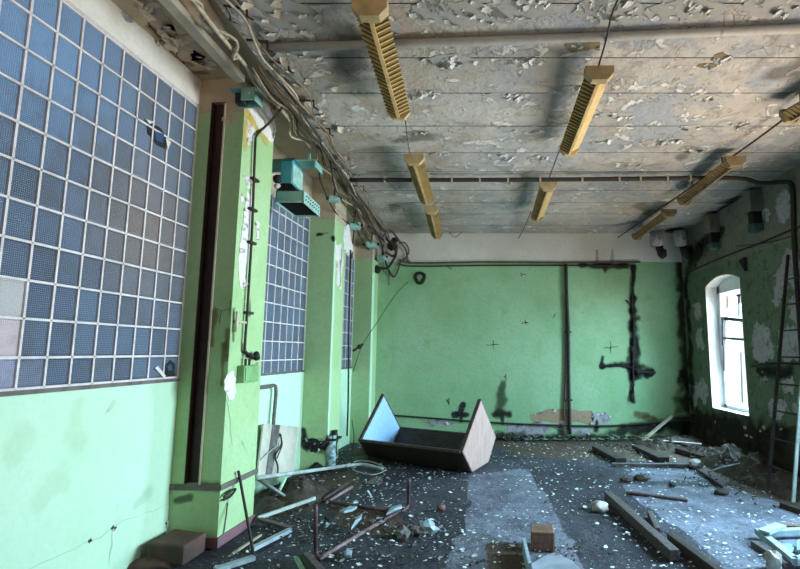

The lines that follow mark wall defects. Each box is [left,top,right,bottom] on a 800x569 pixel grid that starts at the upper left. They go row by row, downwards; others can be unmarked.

peeling [121,0,220,71]
peeling [409,0,554,28]
peeling [571,0,725,27]
peeling [741,0,800,20]
peeling [240,0,357,134]
peeling [697,52,734,70]
peeling [222,97,276,146]
peeling [238,171,260,289]
peeling [762,189,791,224]
peeling [751,247,800,384]
leakage [492,234,792,456]
flaking render [505,409,612,438]